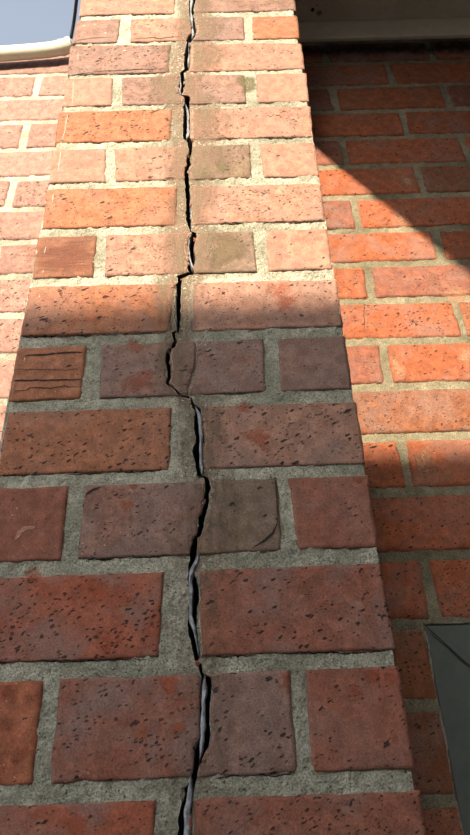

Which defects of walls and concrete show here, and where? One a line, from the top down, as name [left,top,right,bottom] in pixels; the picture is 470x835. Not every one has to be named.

crack [216,127,317,151]
crack [263,218,323,226]
crack [67,0,295,835]
crack [283,648,387,656]
crack [37,656,153,664]